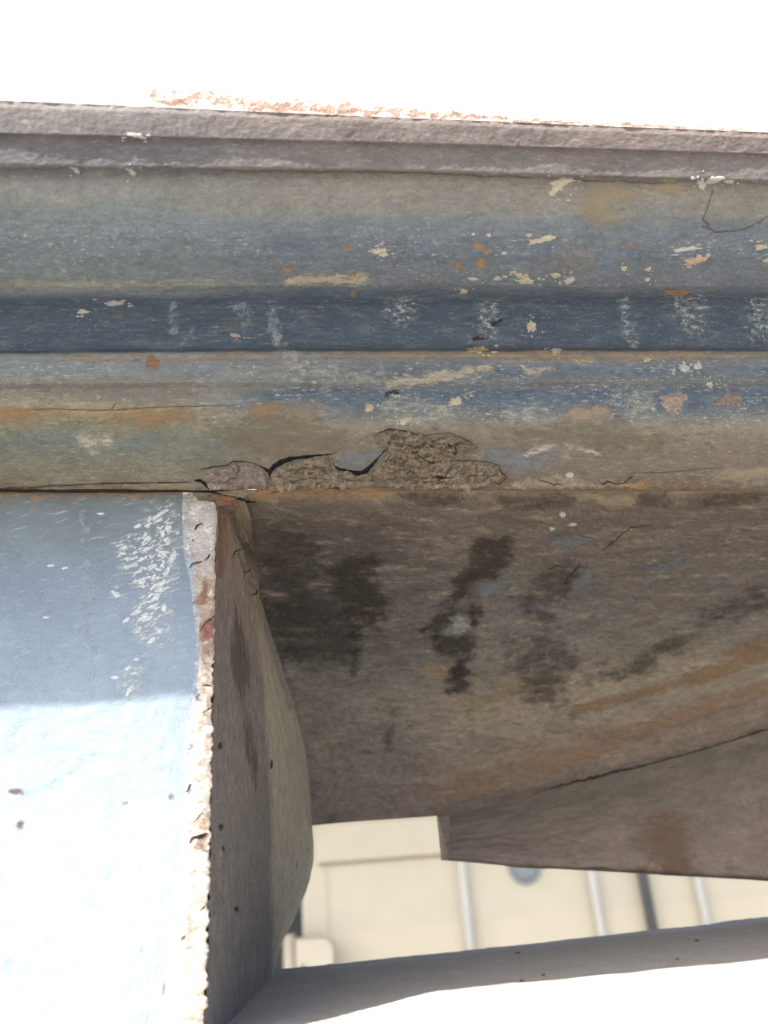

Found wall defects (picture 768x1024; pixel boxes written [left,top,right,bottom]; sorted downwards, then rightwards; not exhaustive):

peeling [547,175,584,202]
peeling [691,170,739,191]
crack [702,191,767,233]
peeling [368,243,395,261]
peeling [525,233,557,245]
peeling [672,242,711,268]
peeling [455,269,575,294]
crack [602,525,650,551]
leakage [331,556,386,666]
leakage [423,536,514,694]
spalling [110,336,502,1024]
crack [535,729,768,793]